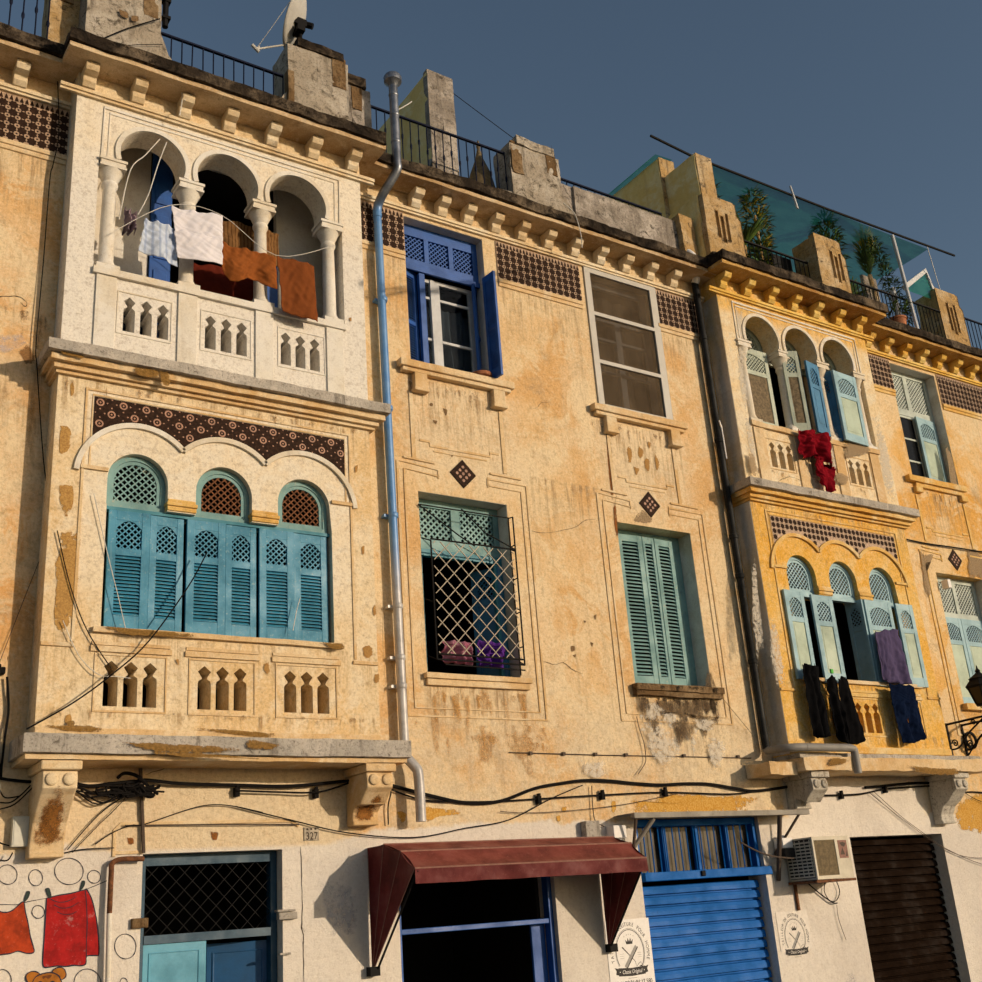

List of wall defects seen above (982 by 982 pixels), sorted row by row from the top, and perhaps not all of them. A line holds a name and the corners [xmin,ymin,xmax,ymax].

flaking render [59,485,74,516]
flaking render [54,532,79,632]
peeling [640,701,725,771]
peeling [581,760,605,778]
peeling [956,793,982,834]